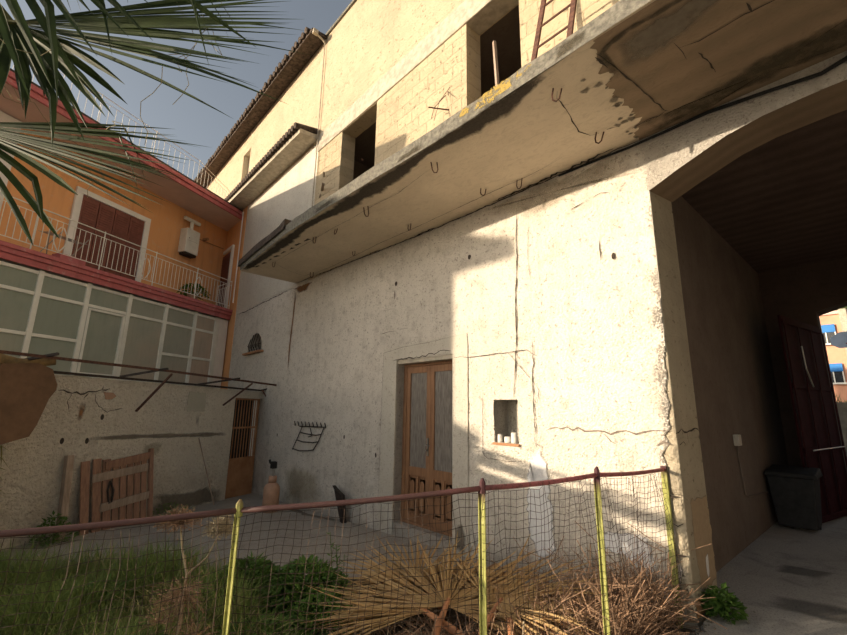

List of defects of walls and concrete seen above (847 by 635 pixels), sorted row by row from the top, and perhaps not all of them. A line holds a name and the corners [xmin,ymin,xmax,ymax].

crack [673,0,774,72]
water stain [244,78,542,269]
crack [237,54,698,462]